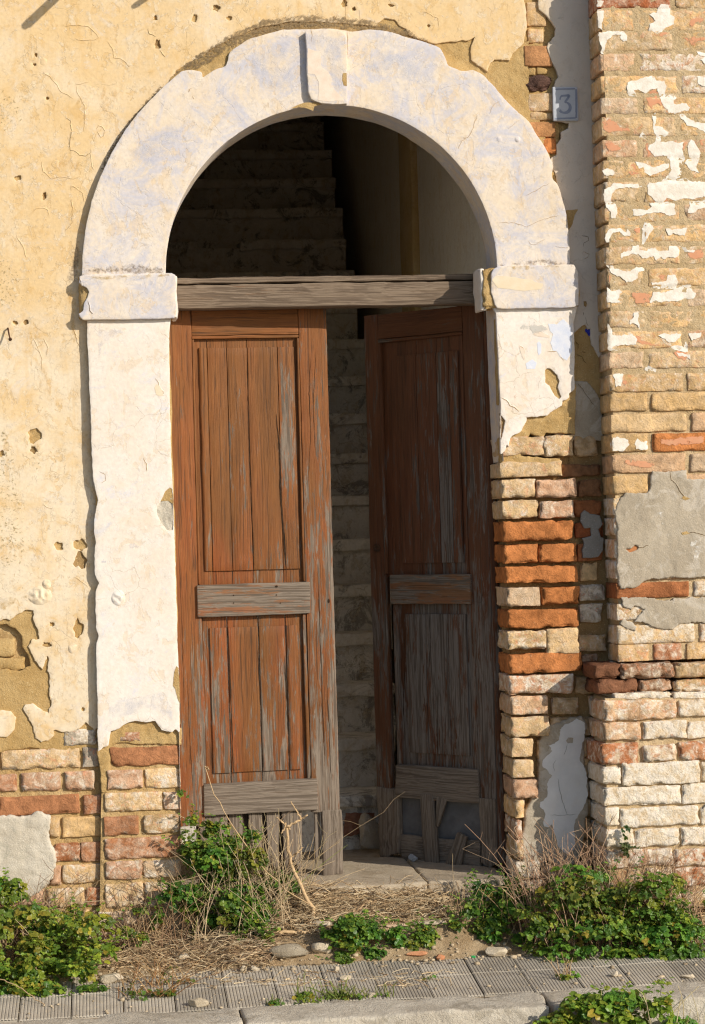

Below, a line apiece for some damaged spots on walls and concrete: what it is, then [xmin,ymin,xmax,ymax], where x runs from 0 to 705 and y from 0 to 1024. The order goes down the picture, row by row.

peeling [597,0,627,54]
peeling [648,4,675,43]
spalling [169,0,559,183]
spalling [28,428,42,454]
spalling [157,488,173,531]
flaking render [490,76,705,890]
spalling [54,539,87,569]
flaking render [0,610,182,944]